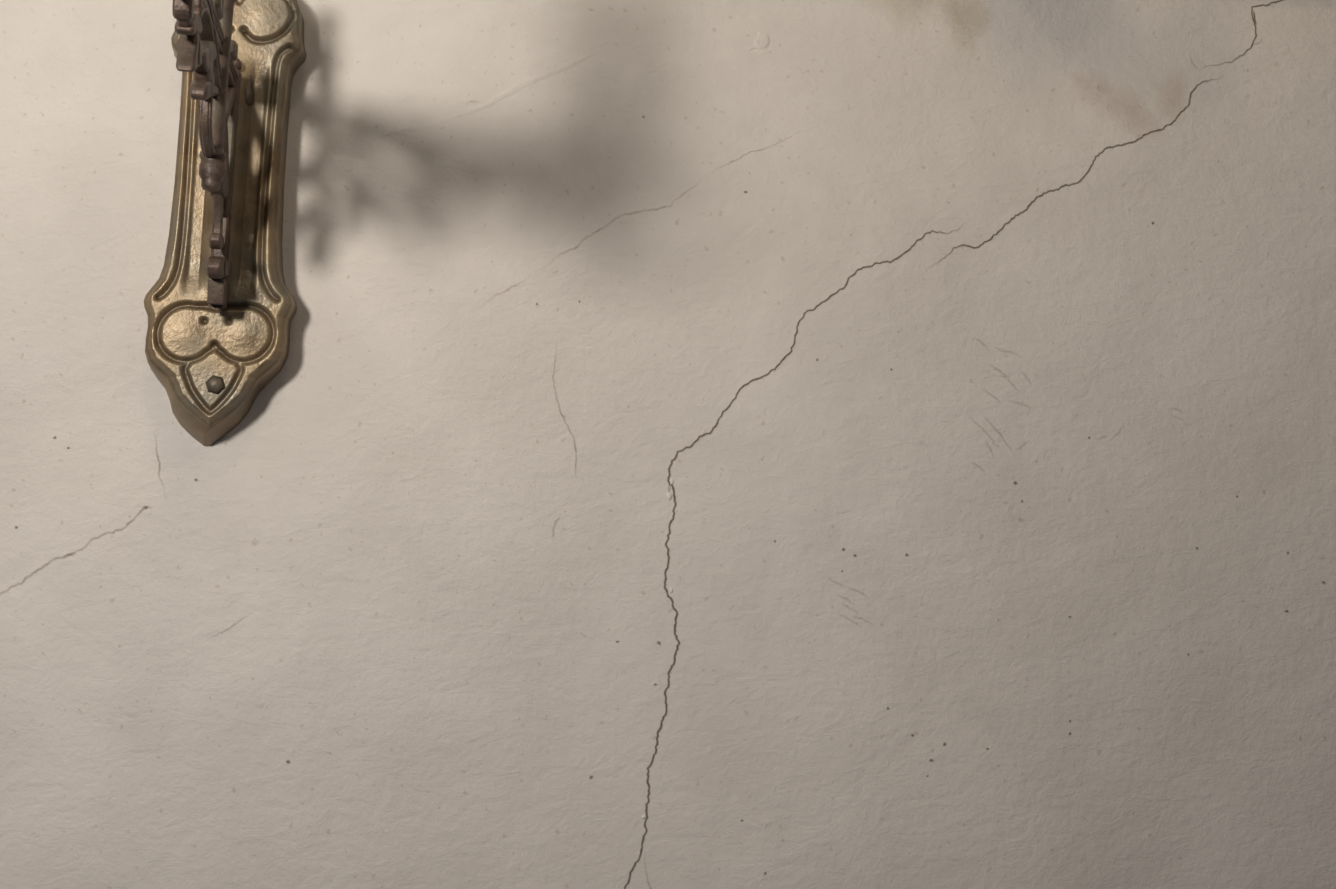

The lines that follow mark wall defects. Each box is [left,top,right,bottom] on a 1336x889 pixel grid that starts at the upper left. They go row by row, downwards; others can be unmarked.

crack [1240,0,1282,56]
crack [624,83,1201,889]